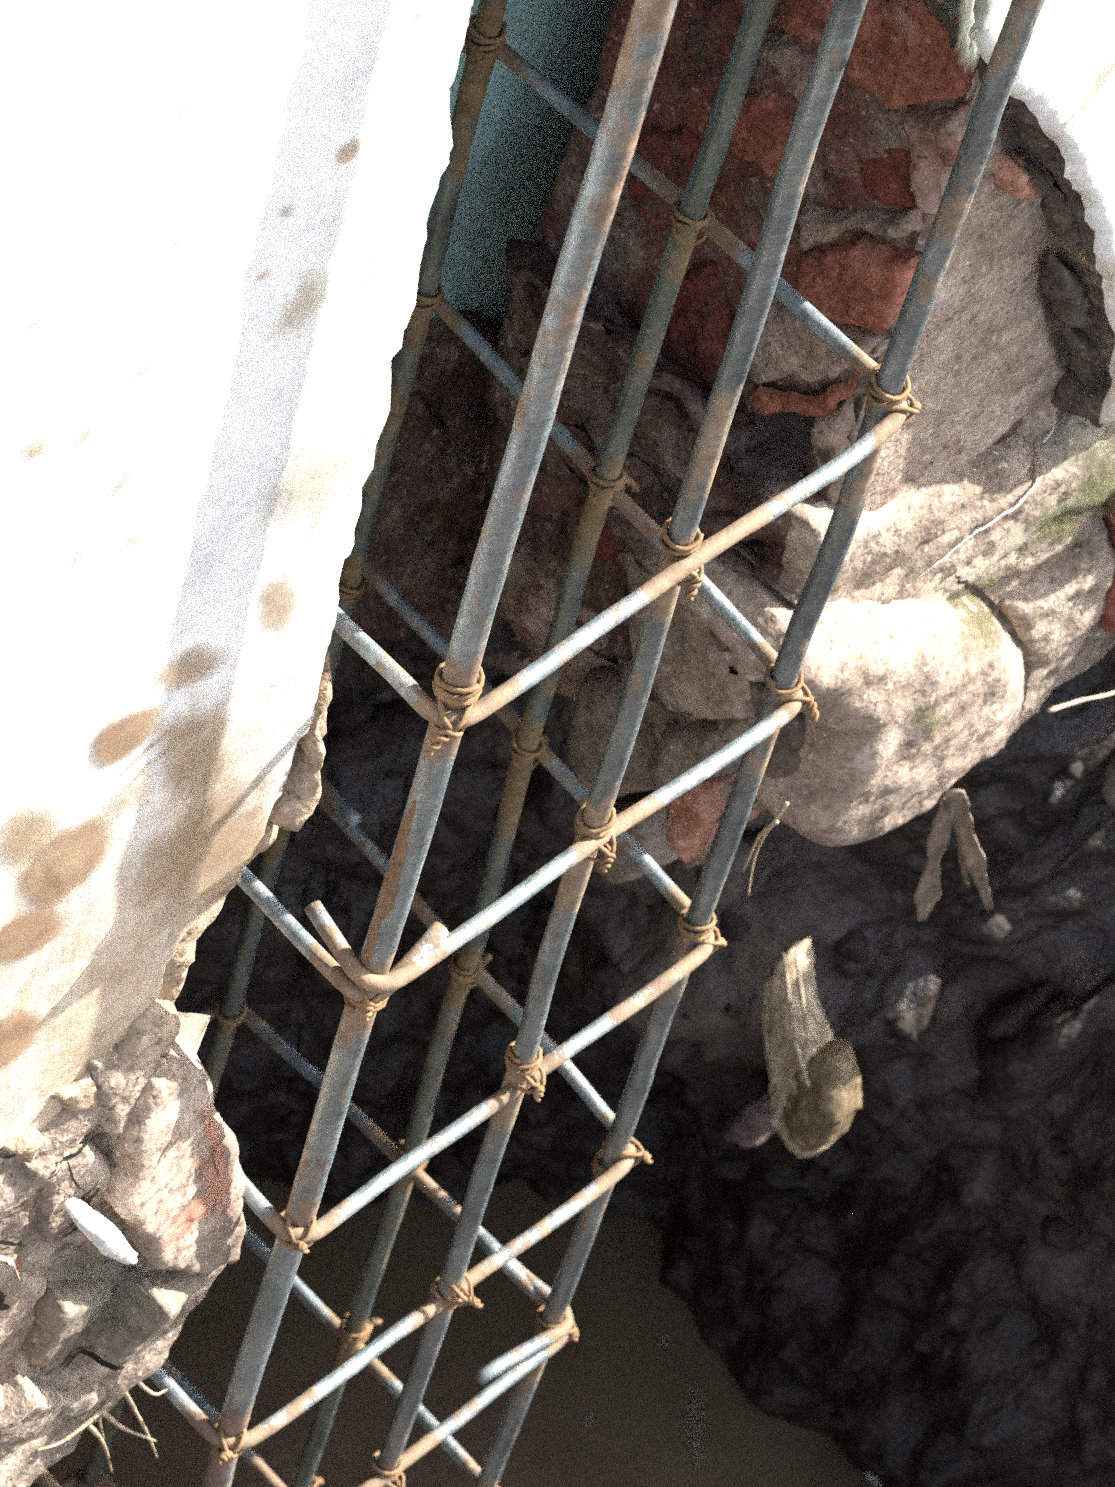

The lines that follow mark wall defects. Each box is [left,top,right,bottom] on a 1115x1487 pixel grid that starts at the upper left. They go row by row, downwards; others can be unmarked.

flaking render [846,0,976,110]
flaking render [794,233,921,358]
water stain [164,651,215,684]
crack [955,575,1032,714]
water stain [96,708,223,781]
spalling [268,705,326,832]
flaking render [664,773,737,865]
water stain [0,817,109,960]
corrosion [362,799,416,968]
water stain [0,1014,42,1066]
crack [48,1132,102,1238]
crack [62,1350,125,1371]